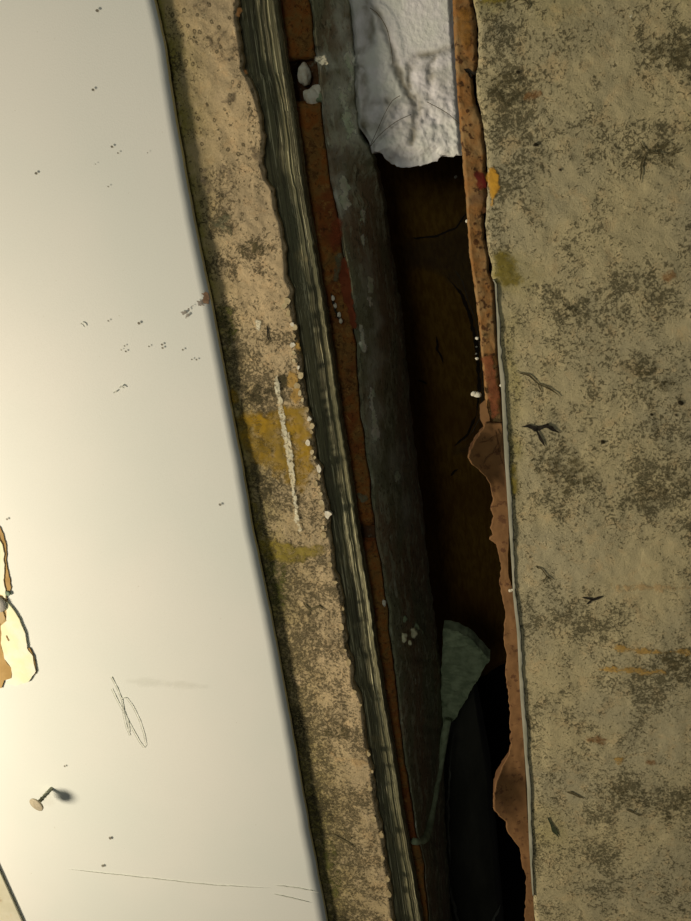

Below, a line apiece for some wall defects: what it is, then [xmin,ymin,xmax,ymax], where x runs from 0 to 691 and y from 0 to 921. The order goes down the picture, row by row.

water stain [633,34,691,79]
water stain [483,71,538,107]
water stain [486,168,500,205]
water stain [230,371,313,532]
crack [522,423,561,446]
water stain [531,440,598,504]
peeling [402,615,420,645]
water stain [600,645,691,683]